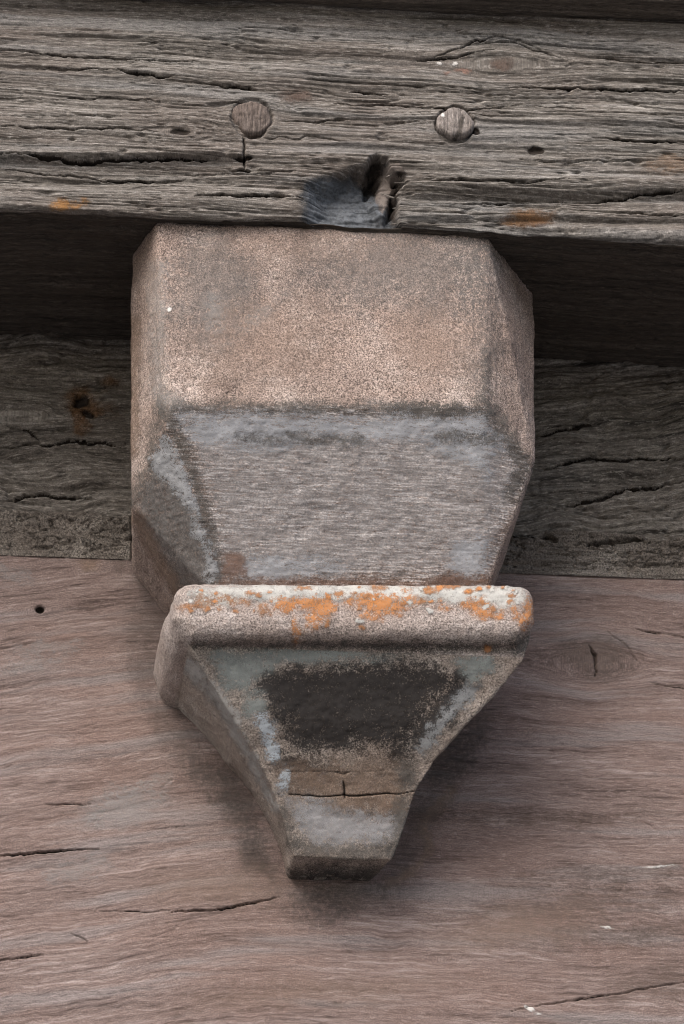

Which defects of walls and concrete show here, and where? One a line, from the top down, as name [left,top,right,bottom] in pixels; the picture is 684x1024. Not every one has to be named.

crack [289,771,407,798]
water stain [184,634,530,881]